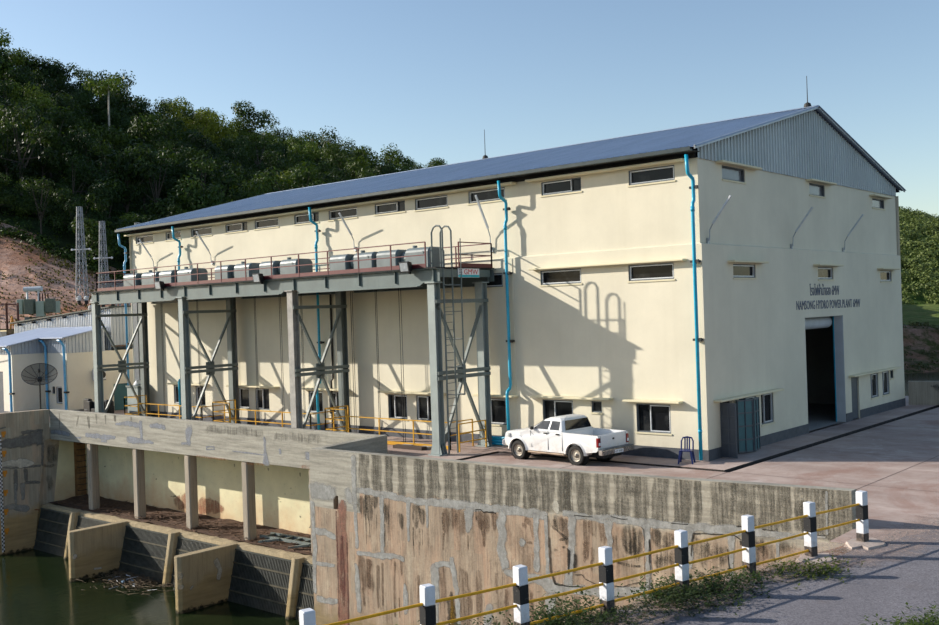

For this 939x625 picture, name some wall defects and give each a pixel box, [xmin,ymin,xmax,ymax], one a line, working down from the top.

corrosion [198,499,223,514]
damp [357,454,853,569]
corrosion [336,500,349,625]
damp [358,556,402,617]
damp [440,569,482,625]
crack [547,515,664,597]
crack [671,523,774,574]